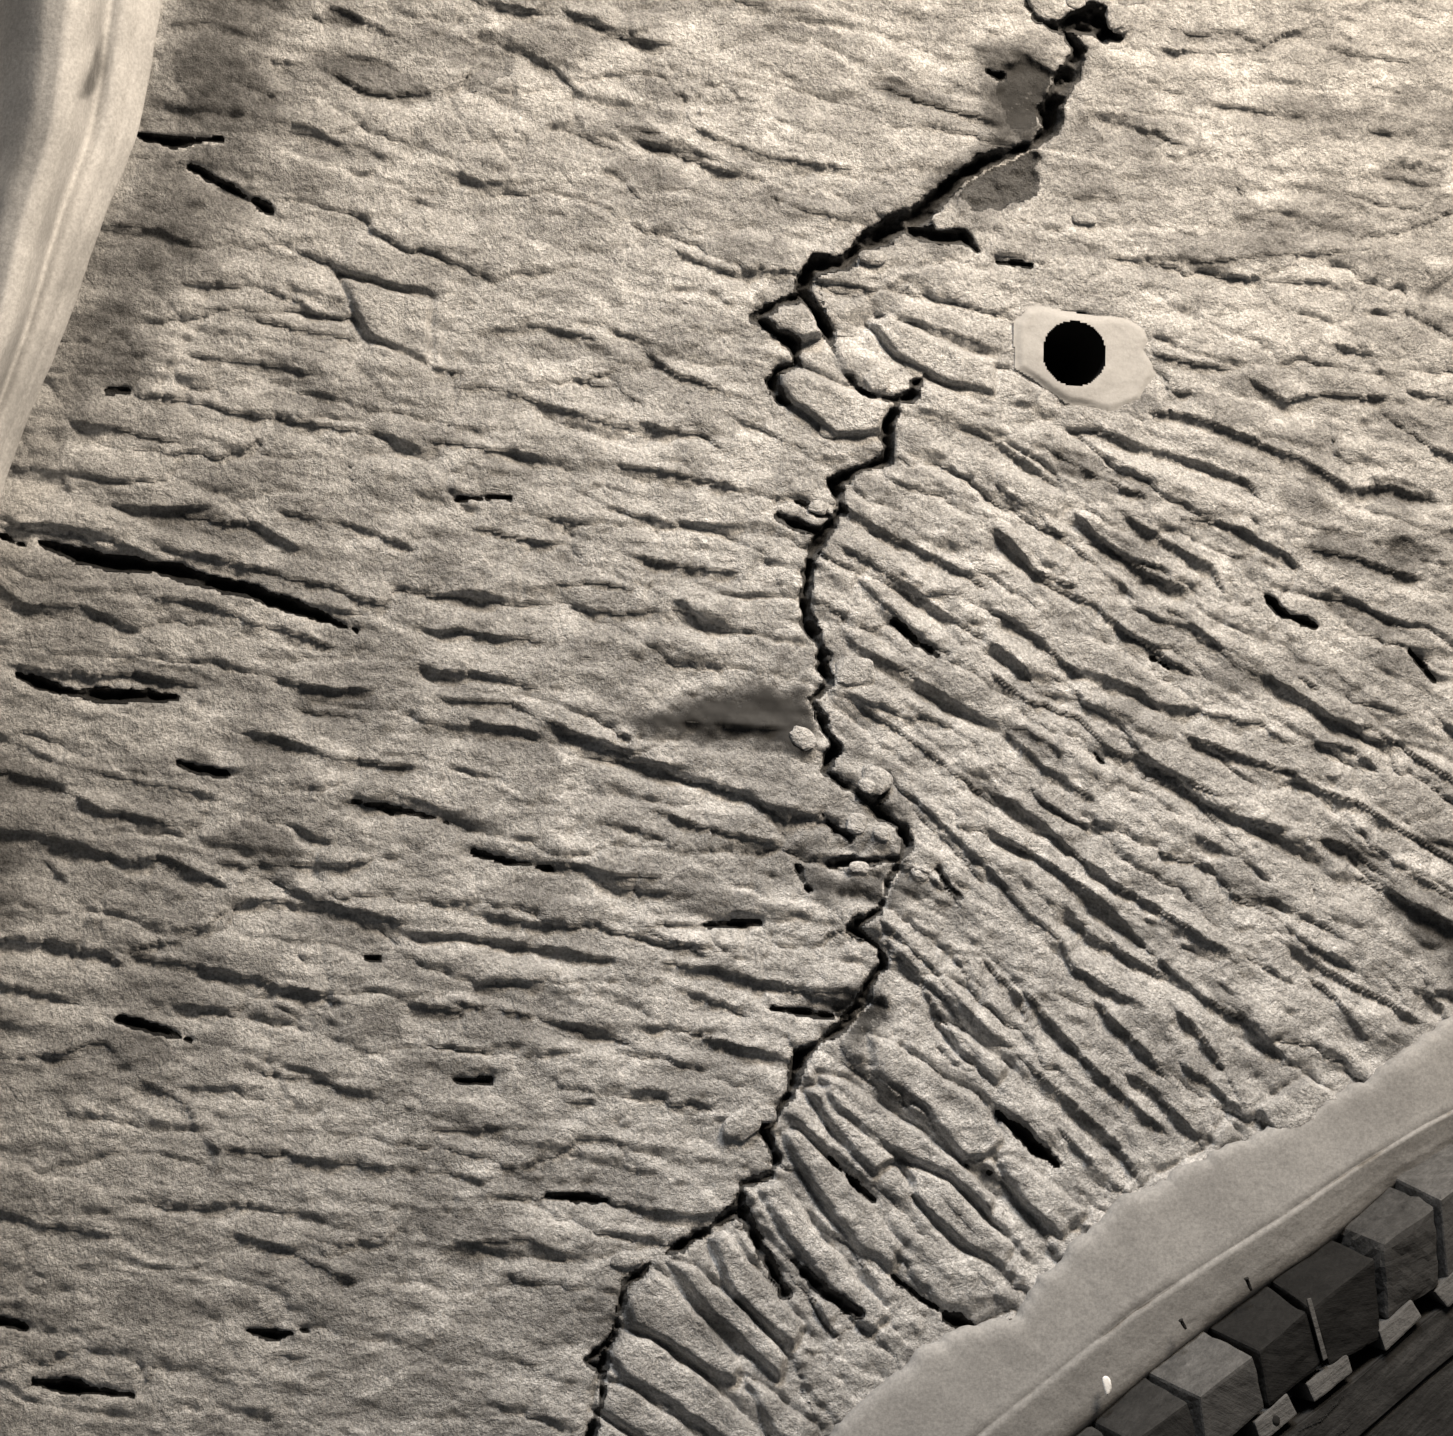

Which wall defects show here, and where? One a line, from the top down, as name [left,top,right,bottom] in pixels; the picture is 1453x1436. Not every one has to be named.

crack [583,0,1133,1436]